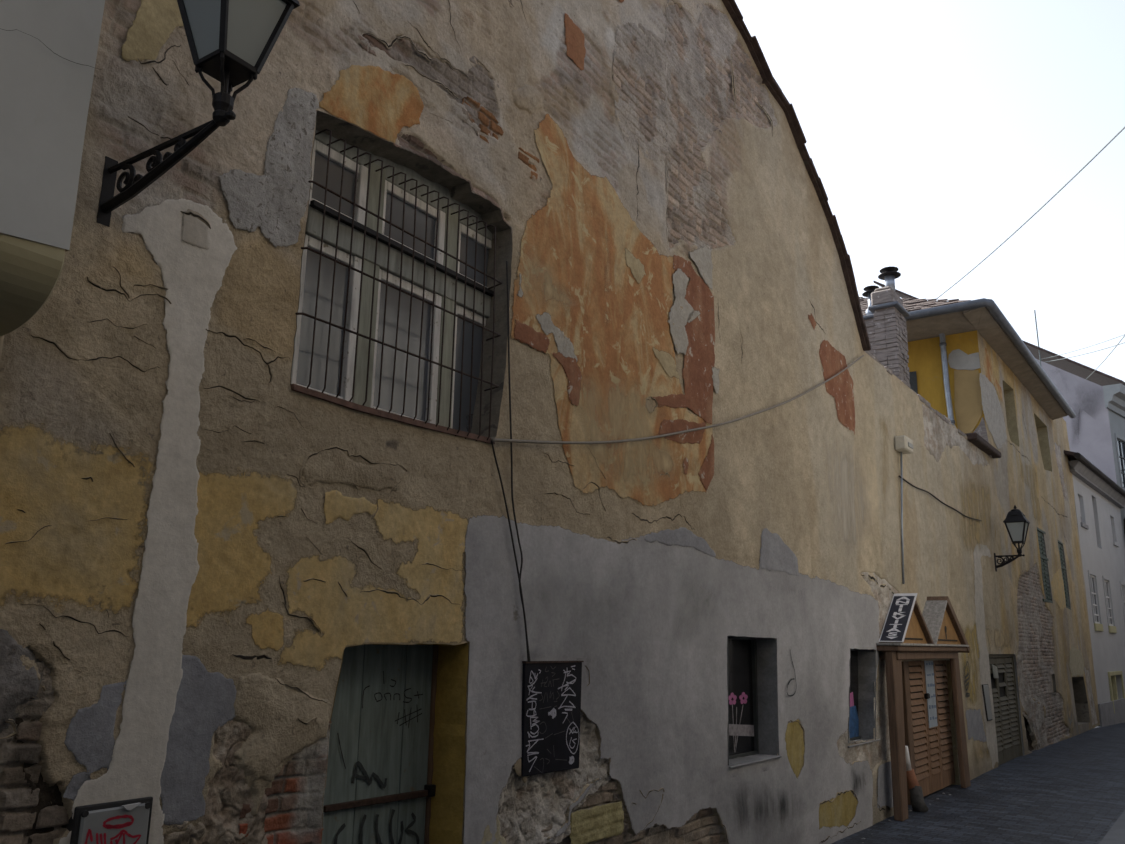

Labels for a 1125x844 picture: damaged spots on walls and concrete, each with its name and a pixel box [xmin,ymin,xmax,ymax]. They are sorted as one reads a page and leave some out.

spalling [219,34,504,247]
crack [22,604,128,660]
peeling [0,423,153,614]
crack [31,267,172,372]
crack [109,433,135,467]
peeling [186,470,468,671]
crack [205,329,458,634]
crack [544,446,695,544]
flaking render [511,0,778,507]
peeling [819,339,855,434]
flaking render [0,661,90,844]
flaking render [497,712,727,844]